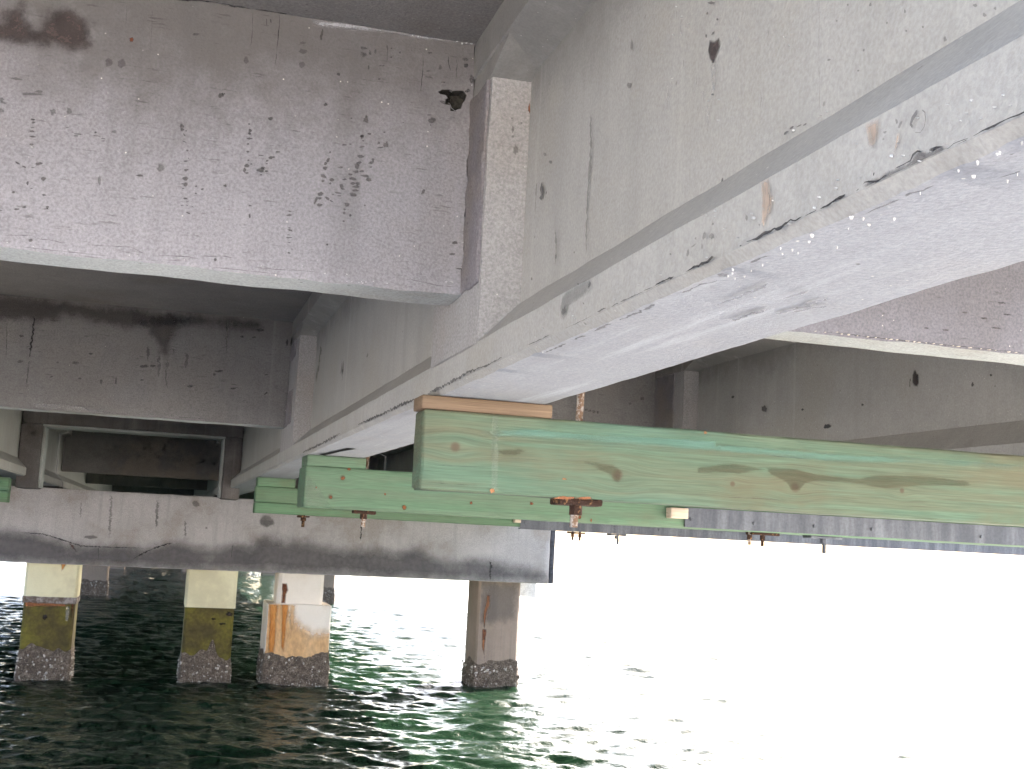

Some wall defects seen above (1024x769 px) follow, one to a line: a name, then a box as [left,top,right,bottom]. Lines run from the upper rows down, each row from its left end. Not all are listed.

damp [0,10,90,49]
spalling [426,58,474,112]
crack [740,112,1024,263]
crack [531,256,728,352]
crack [303,357,502,453]
damp [0,533,542,579]
corrosion [265,584,330,658]